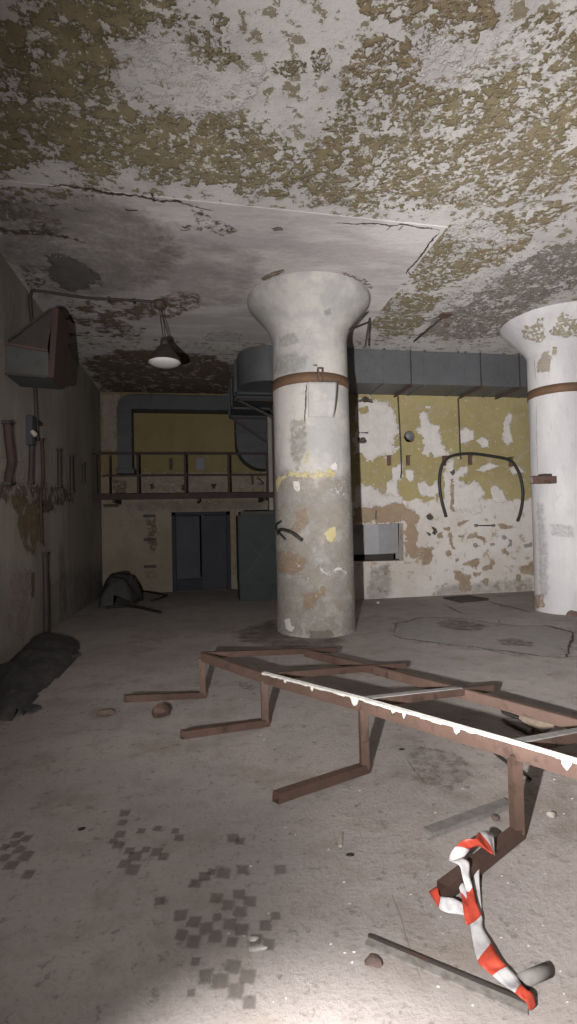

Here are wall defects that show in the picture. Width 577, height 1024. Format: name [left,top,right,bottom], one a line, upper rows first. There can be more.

damp [1,205,233,394]
crack [41,184,212,234]
peeling [0,0,577,373]
crack [342,223,440,275]
peeling [229,394,532,591]
crack [393,601,575,658]